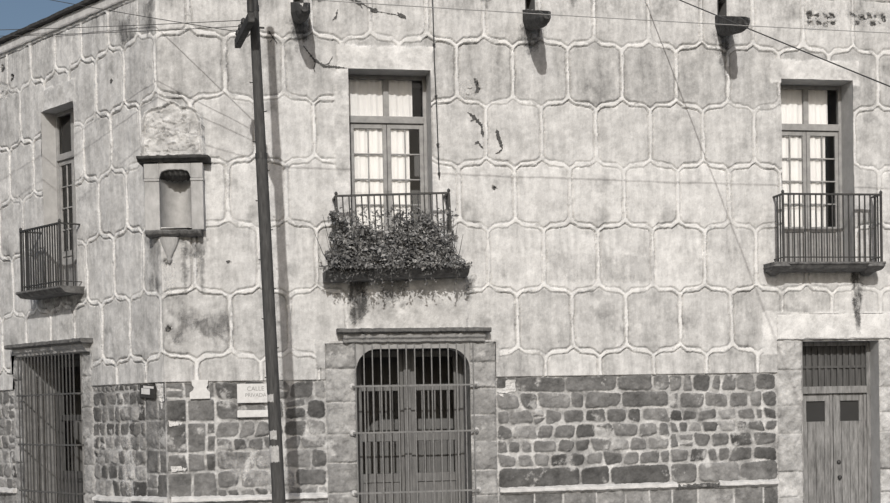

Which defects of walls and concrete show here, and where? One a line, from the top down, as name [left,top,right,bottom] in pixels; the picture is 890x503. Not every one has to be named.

crack [318,0,406,20]
flaking render [462,78,480,99]
damp [349,282,368,323]